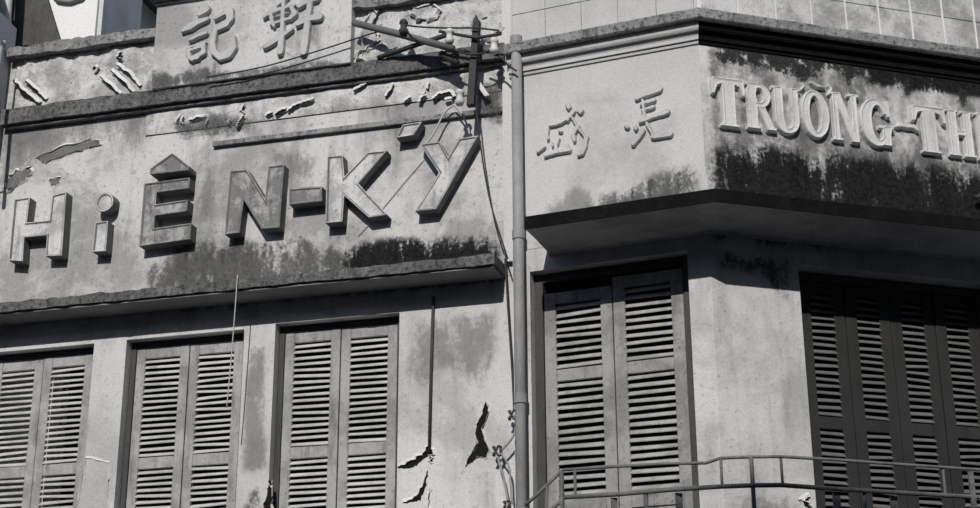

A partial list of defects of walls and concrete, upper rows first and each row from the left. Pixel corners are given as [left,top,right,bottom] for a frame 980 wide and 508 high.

spalling [3,139,103,195]
leakage [713,145,980,218]
leakage [149,237,499,288]
spalling [465,400,491,468]